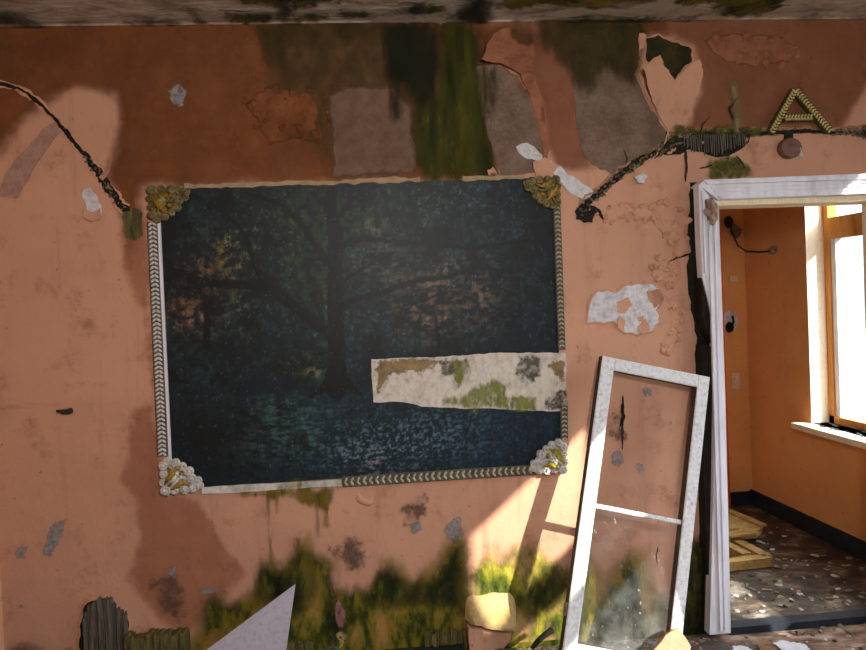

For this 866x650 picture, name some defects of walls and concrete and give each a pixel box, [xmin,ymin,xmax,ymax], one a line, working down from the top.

crack [0,80,143,240]
water stain [0,0,866,209]
spalling [475,0,729,199]
crack [575,97,866,223]
spalling [585,281,665,337]
crack [618,396,626,450]
mould [337,538,364,570]